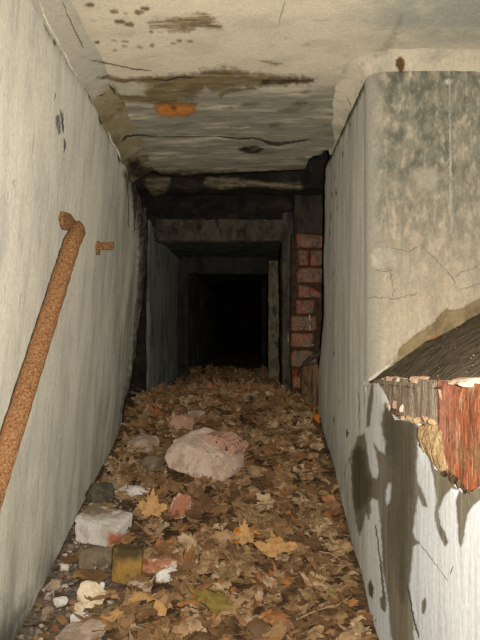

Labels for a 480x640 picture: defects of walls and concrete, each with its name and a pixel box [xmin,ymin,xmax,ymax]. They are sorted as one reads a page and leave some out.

damp [150,13,221,32]
damp [102,75,196,83]
rust [155,103,194,117]
crack [121,134,311,146]
spalling [363,299,480,494]
damp [425,451,480,545]
damp [352,403,427,640]